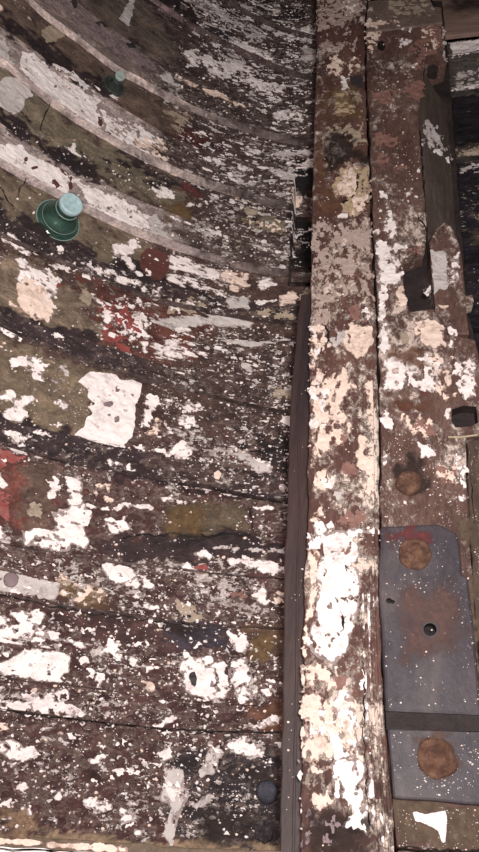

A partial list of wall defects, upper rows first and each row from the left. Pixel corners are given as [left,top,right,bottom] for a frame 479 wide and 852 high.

peeling [41,26,65,43]
peeling [0,34,168,164]
peeling [119,0,135,26]
peeling [160,0,479,165]
peeling [0,98,479,511]
peeling [0,389,62,540]
rust [394,452,430,493]
peeling [0,467,285,846]
peeling [297,434,390,848]
peeling [0,838,128,852]
peeling [413,811,447,843]
crack [400,844,479,852]